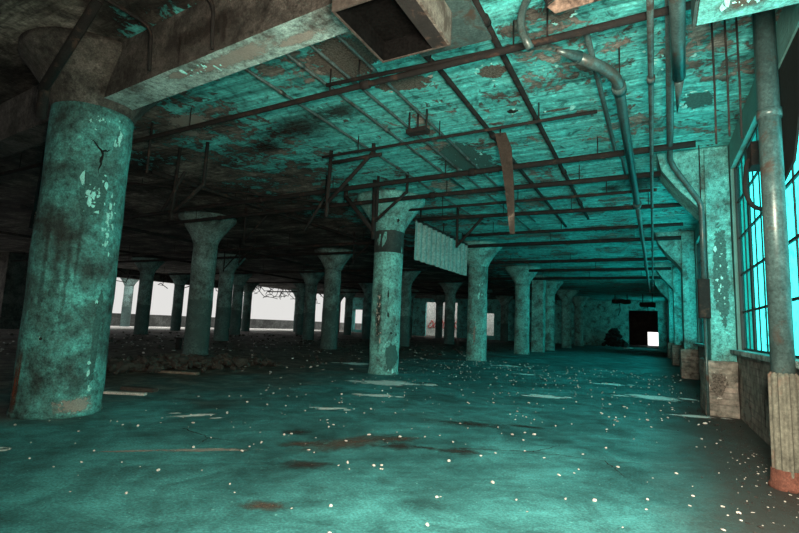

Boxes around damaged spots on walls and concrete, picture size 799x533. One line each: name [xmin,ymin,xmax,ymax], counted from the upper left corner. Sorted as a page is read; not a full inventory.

crack [91,139,110,173]
peeling [79,171,116,256]